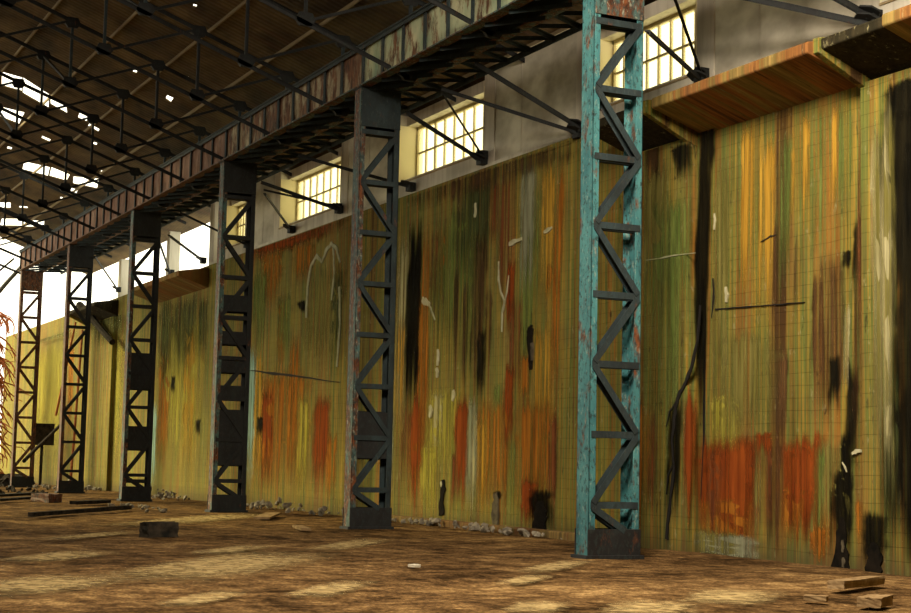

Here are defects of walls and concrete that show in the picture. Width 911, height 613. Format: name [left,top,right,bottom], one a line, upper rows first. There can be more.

corrosion [253,220,341,493]
water stain [392,224,422,481]
corrosion [409,233,445,502]
corrosion [451,163,564,521]
corrosion [639,401,657,518]
water stain [644,128,728,436]
corrosion [684,387,832,560]
water stain [740,110,861,474]
water stain [876,79,911,554]